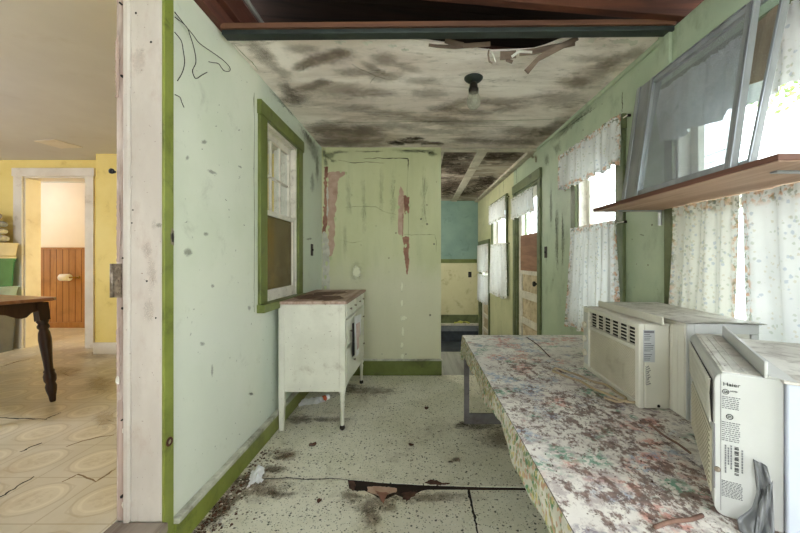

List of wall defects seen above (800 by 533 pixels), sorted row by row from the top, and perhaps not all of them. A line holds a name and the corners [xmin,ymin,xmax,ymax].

leakage [390,137,442,145]
leakage [441,152,495,196]
leakage [484,152,520,160]
peeling [322,166,347,290]
peeling [395,187,411,274]
crack [62,469,115,482]
crack [242,474,346,482]
crack [468,493,477,532]